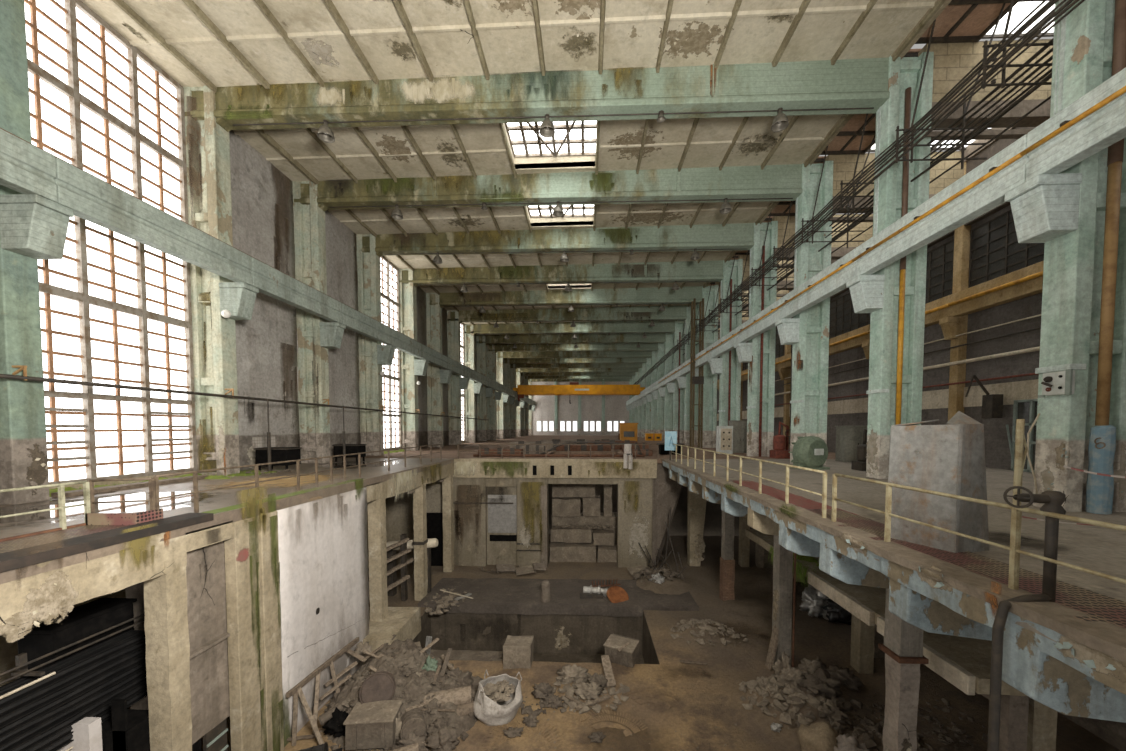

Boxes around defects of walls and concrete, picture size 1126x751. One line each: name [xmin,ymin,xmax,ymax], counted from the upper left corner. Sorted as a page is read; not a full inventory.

peeling [494,0,533,18]
peeling [554,0,603,58]
peeling [658,21,734,60]
damp [317,80,371,105]
damp [401,78,474,103]
damp [517,70,569,96]
peeling [376,133,414,163]
peeling [608,127,664,160]
spalling [0,571,79,643]
damp [250,555,260,669]
peeling [1053,636,1126,682]